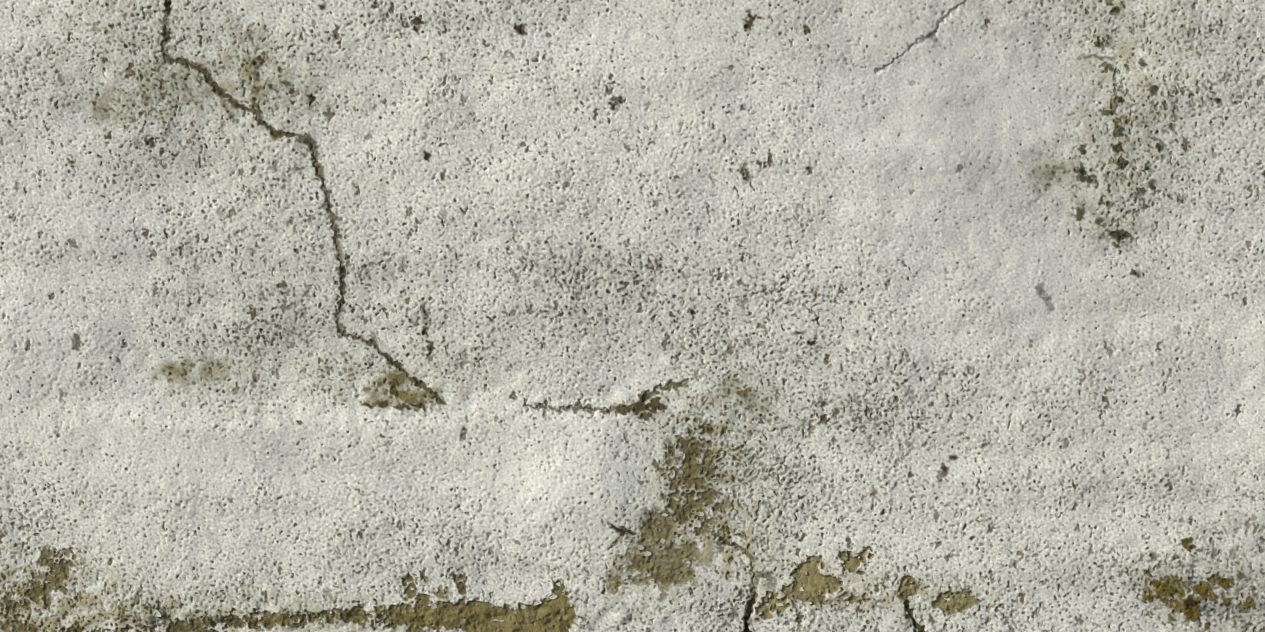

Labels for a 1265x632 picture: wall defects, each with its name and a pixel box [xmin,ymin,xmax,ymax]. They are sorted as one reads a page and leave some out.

crack [159,0,446,404]
crack [528,380,689,414]
peeling [605,424,744,594]
peeling [0,547,76,632]
peeling [53,572,578,632]
crack [711,532,771,632]
peeling [755,546,874,622]
peeling [898,576,922,602]
crack [903,596,925,632]
peeling [933,590,982,615]